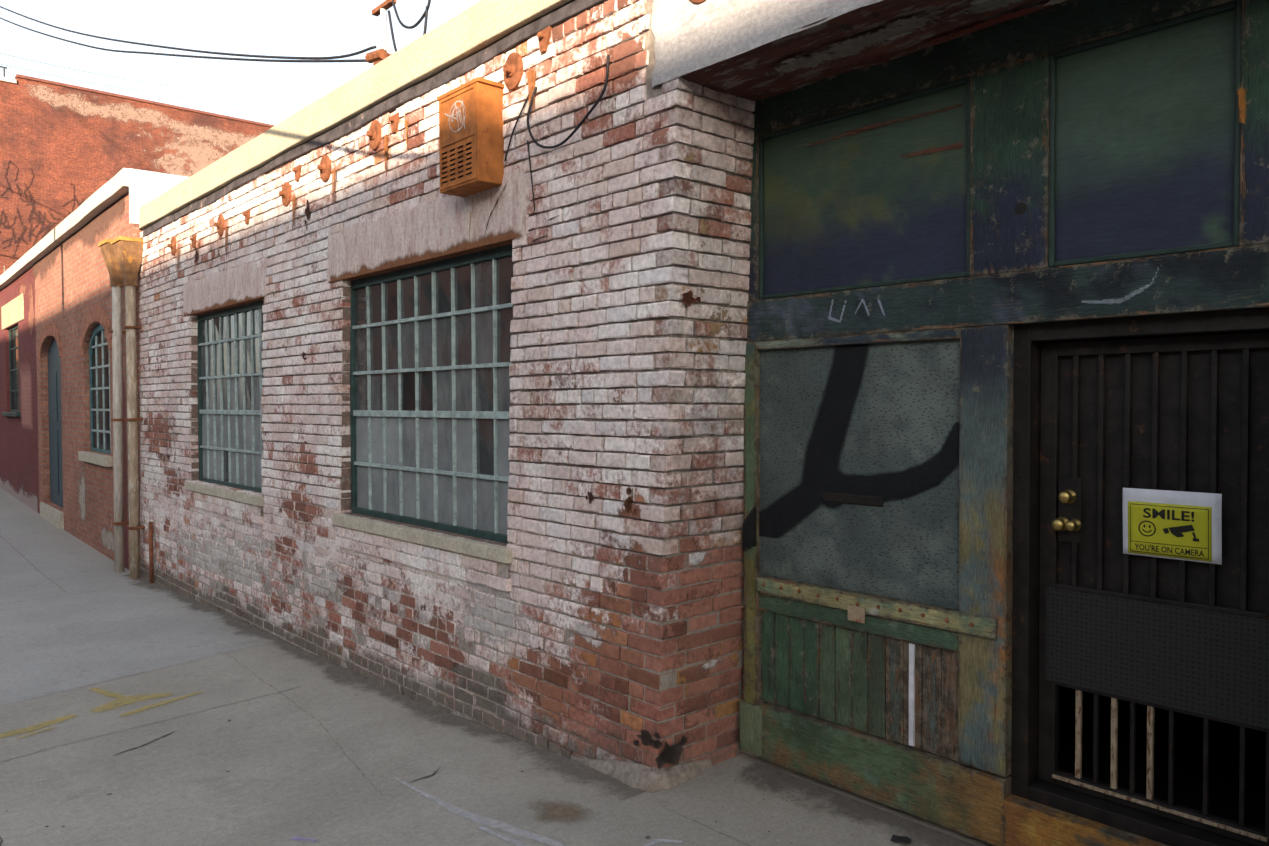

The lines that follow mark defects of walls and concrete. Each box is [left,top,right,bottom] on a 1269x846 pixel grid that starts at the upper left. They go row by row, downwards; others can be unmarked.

peeling [751,0,1068,78]
peeling [144,413,185,497]
peeling [299,441,317,477]
peeling [279,491,322,528]
peeling [275,536,298,562]
peeling [267,592,286,614]
peeling [334,576,368,612]
peeling [369,572,472,687]
peeling [507,535,744,771]